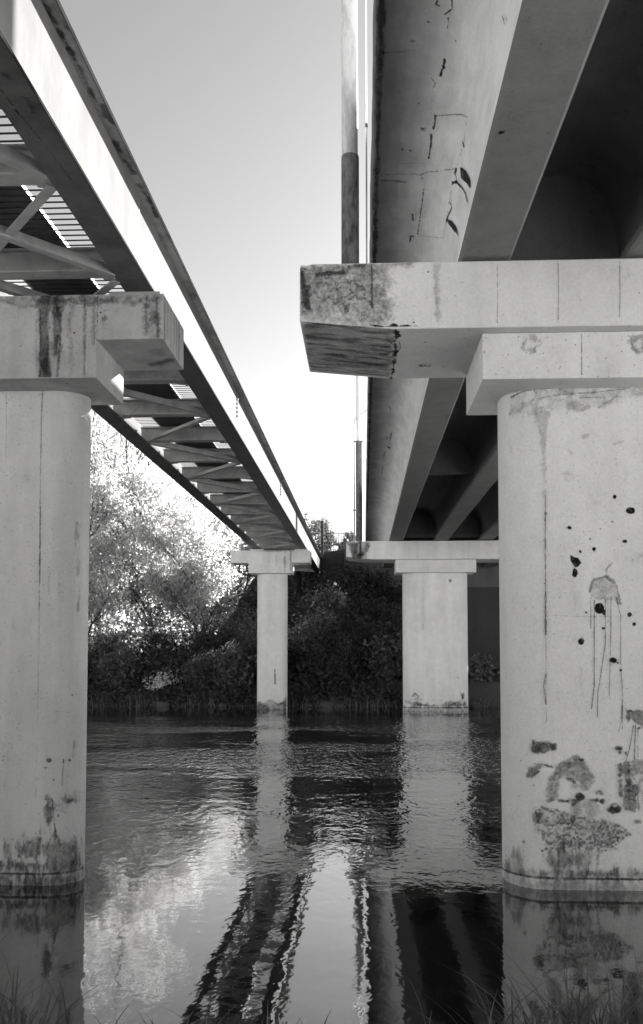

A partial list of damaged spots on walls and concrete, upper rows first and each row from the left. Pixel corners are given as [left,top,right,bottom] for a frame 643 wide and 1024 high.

crack [409,114,466,242]
damp [36,295,114,377]
damp [589,576,621,717]
damp [0,798,84,886]
damp [502,845,643,890]